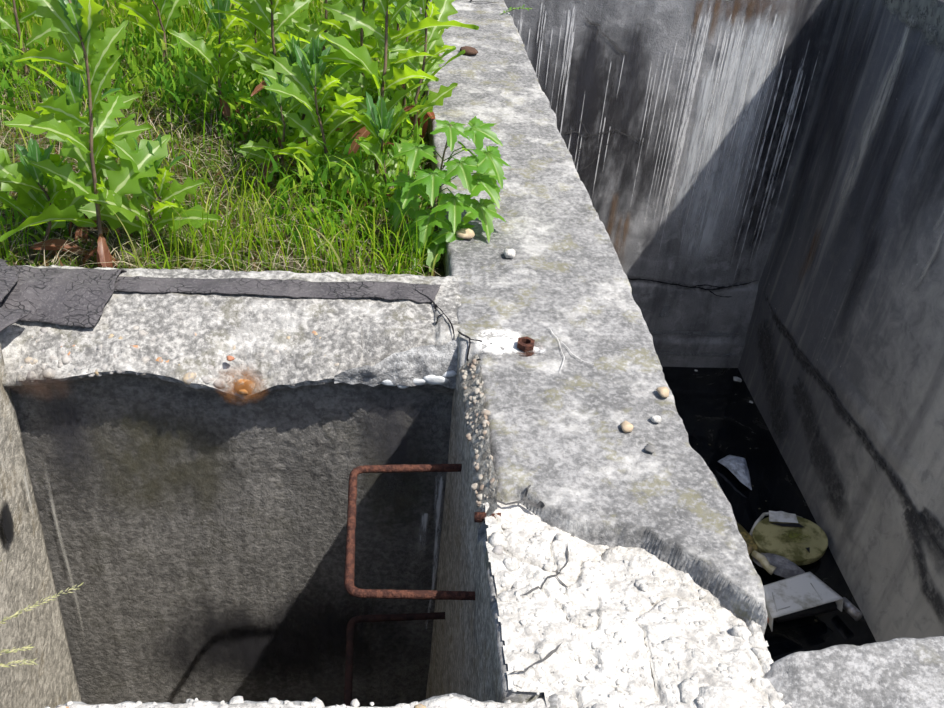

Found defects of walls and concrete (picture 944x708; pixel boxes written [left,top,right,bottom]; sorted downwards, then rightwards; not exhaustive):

leakage [513,0,874,261]
leakage [843,28,909,214]
crack [627,277,757,297]
leakage [380,405,416,507]
spalling [17,325,792,708]
leakage [758,298,944,618]
leakage [200,604,368,673]